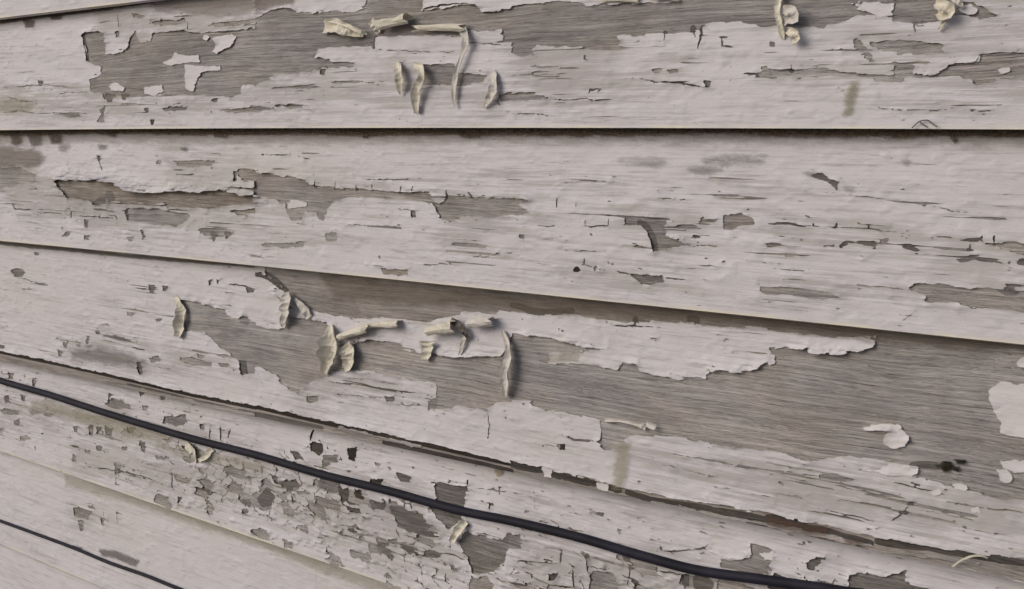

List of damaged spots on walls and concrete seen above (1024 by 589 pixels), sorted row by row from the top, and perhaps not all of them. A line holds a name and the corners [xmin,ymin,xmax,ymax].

peeling [81,0,1024,125]
peeling [55,168,529,250]
peeling [622,215,683,252]
spalling [699,213,755,230]
spalling [839,235,1024,266]
spalling [50,328,170,375]
peeling [138,267,1024,535]
spalling [72,413,231,503]
spalling [74,504,118,531]
spalling [224,429,786,589]
peeling [801,557,825,583]
peeling [844,570,928,589]